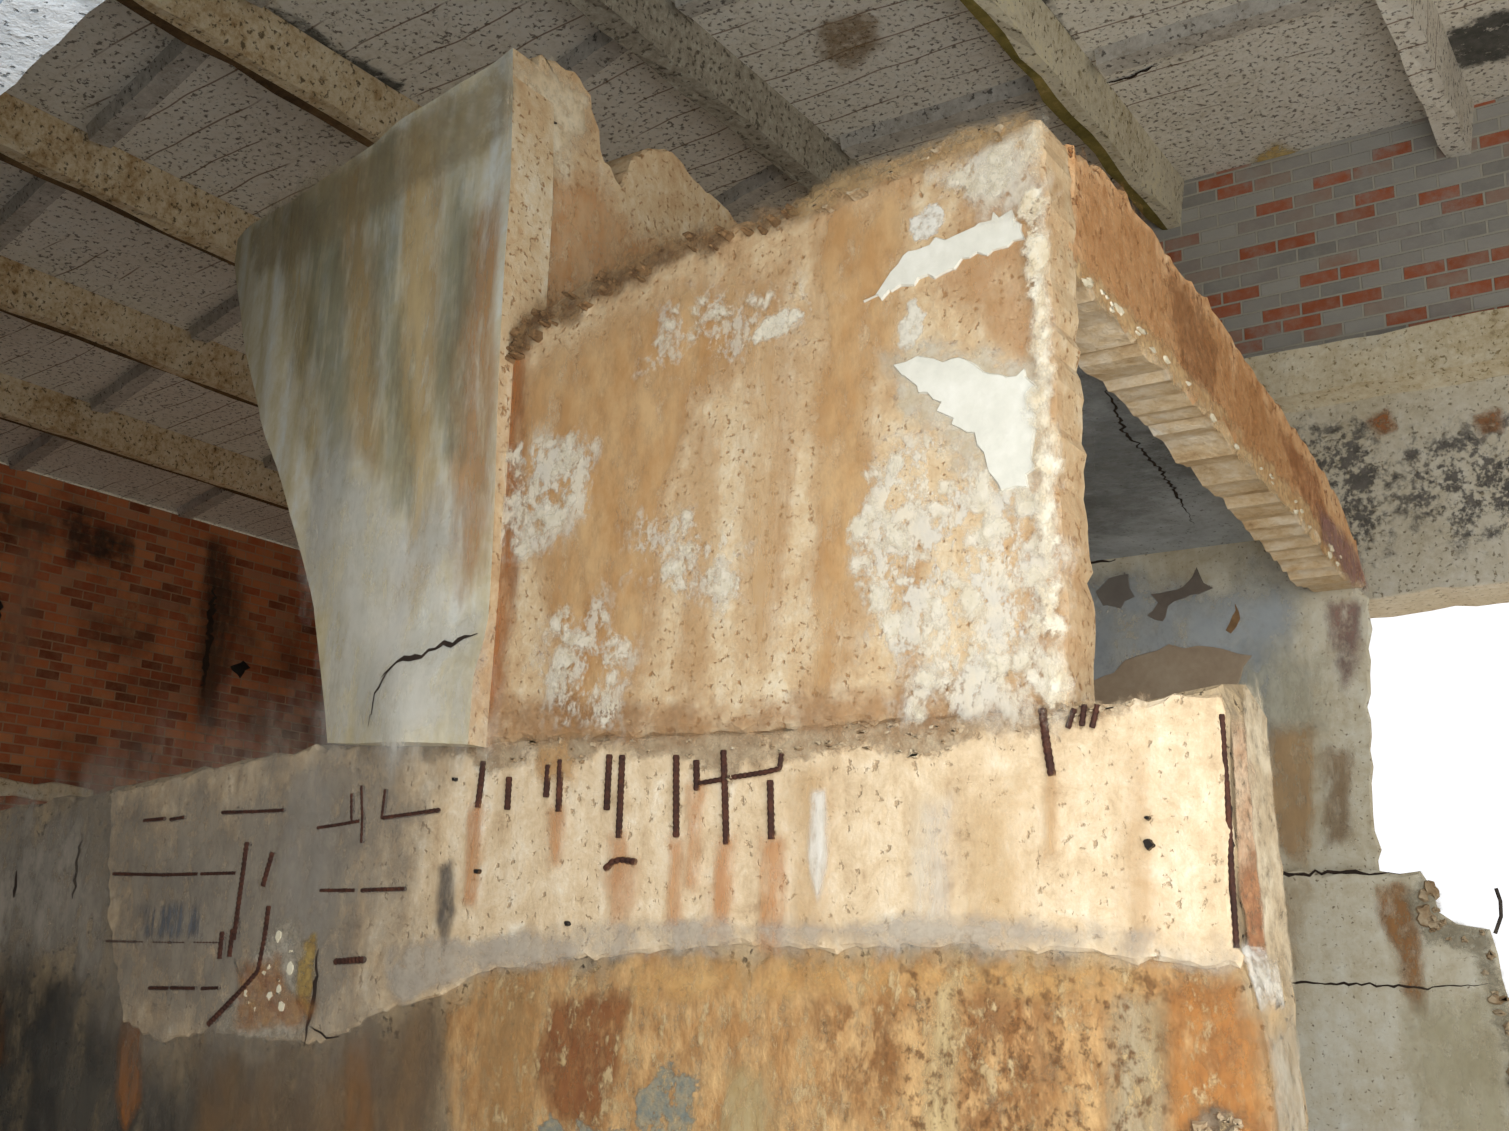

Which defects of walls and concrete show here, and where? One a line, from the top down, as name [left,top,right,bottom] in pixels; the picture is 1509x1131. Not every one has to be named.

damp [1448,11,1509,68]
peeling [423,116,1252,948]
crack [1104,384,1194,523]
damp [1303,417,1509,545]
damp [0,196,468,1131]
crack [368,633,477,725]
crack [1283,869,1398,877]
spalling [1409,880,1509,1047]